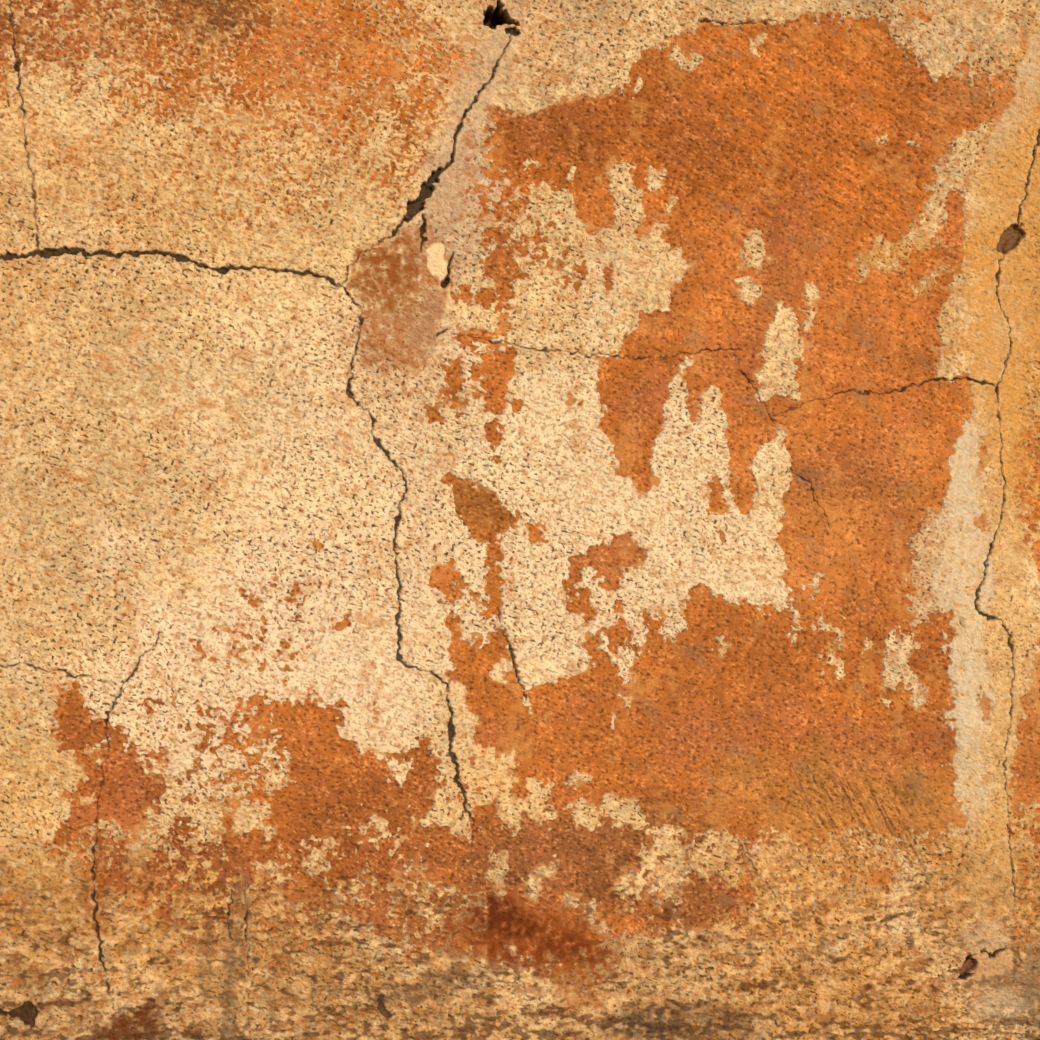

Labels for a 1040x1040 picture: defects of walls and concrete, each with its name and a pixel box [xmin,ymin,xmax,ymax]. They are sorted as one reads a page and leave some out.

crack [1017,129,1040,224]
peeling [227,589,267,653]
crack [0,0,512,848]
peeling [281,641,295,672]
peeling [285,587,300,606]
peeling [423,357,470,424]
peeling [429,473,548,690]
crack [436,255,1018,920]
peeling [451,12,1018,937]
crack [0,632,163,1012]
peeling [80,692,479,951]
flaking render [954,949,1007,981]